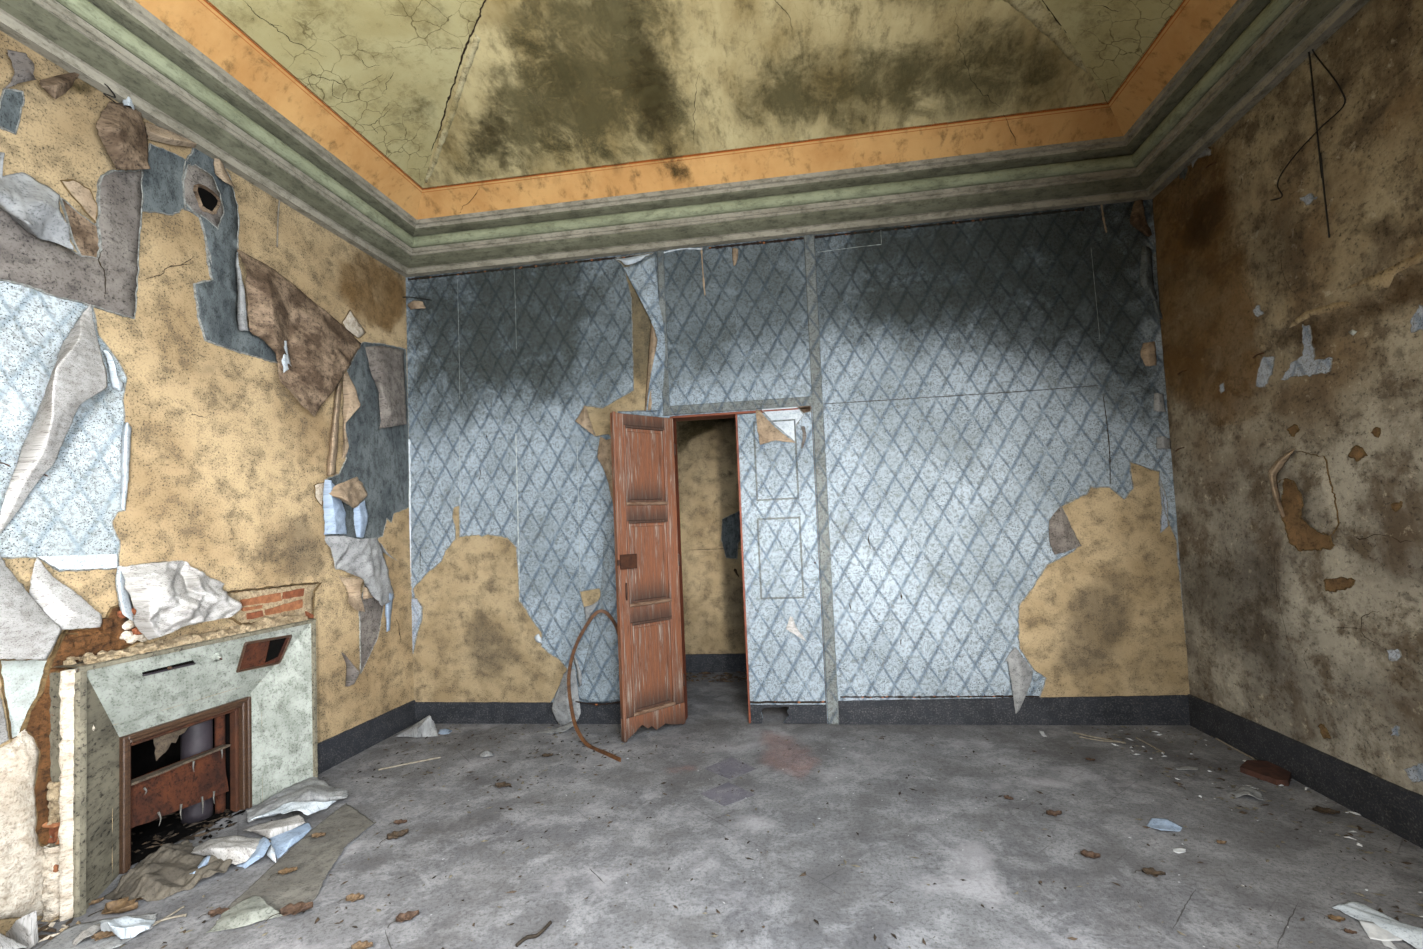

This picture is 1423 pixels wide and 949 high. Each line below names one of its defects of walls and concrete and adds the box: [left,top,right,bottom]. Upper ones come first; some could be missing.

crack [424,0,486,179]
leakage [469,0,687,162]
leakage [757,24,1055,123]
flaking render [60,179,98,223]
spalling [182,164,225,229]
leakage [669,147,687,177]
flaking render [342,309,366,339]
flaking render [1268,424,1340,552]
flaking render [1348,427,1381,462]
peeling [413,505,568,703]
peeling [1017,461,1190,697]
flaking render [0,605,148,921]